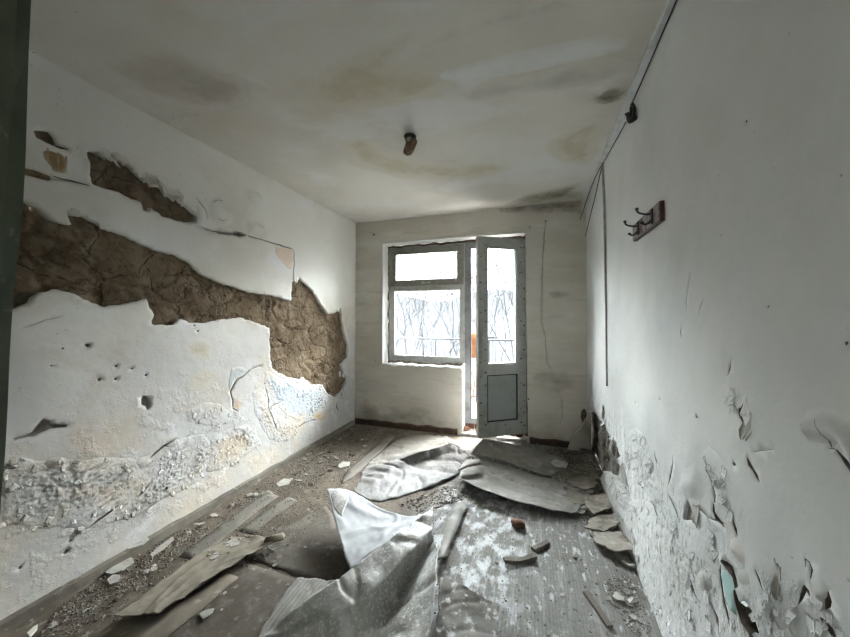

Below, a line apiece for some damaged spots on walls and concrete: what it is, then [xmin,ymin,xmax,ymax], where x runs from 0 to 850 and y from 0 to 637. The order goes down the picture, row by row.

leakage [91,40,280,120]
spalling [25,168,51,181]
spalling [87,148,198,222]
leakage [330,128,519,182]
leakage [540,115,612,168]
spalling [0,202,347,534]
peeling [581,409,846,637]